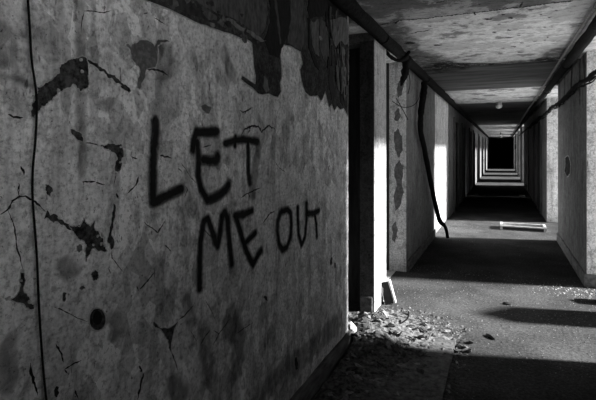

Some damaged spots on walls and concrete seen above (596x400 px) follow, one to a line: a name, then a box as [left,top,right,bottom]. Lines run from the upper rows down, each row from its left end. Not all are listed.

peeling [144,0,349,117]
peeling [393,108,404,211]